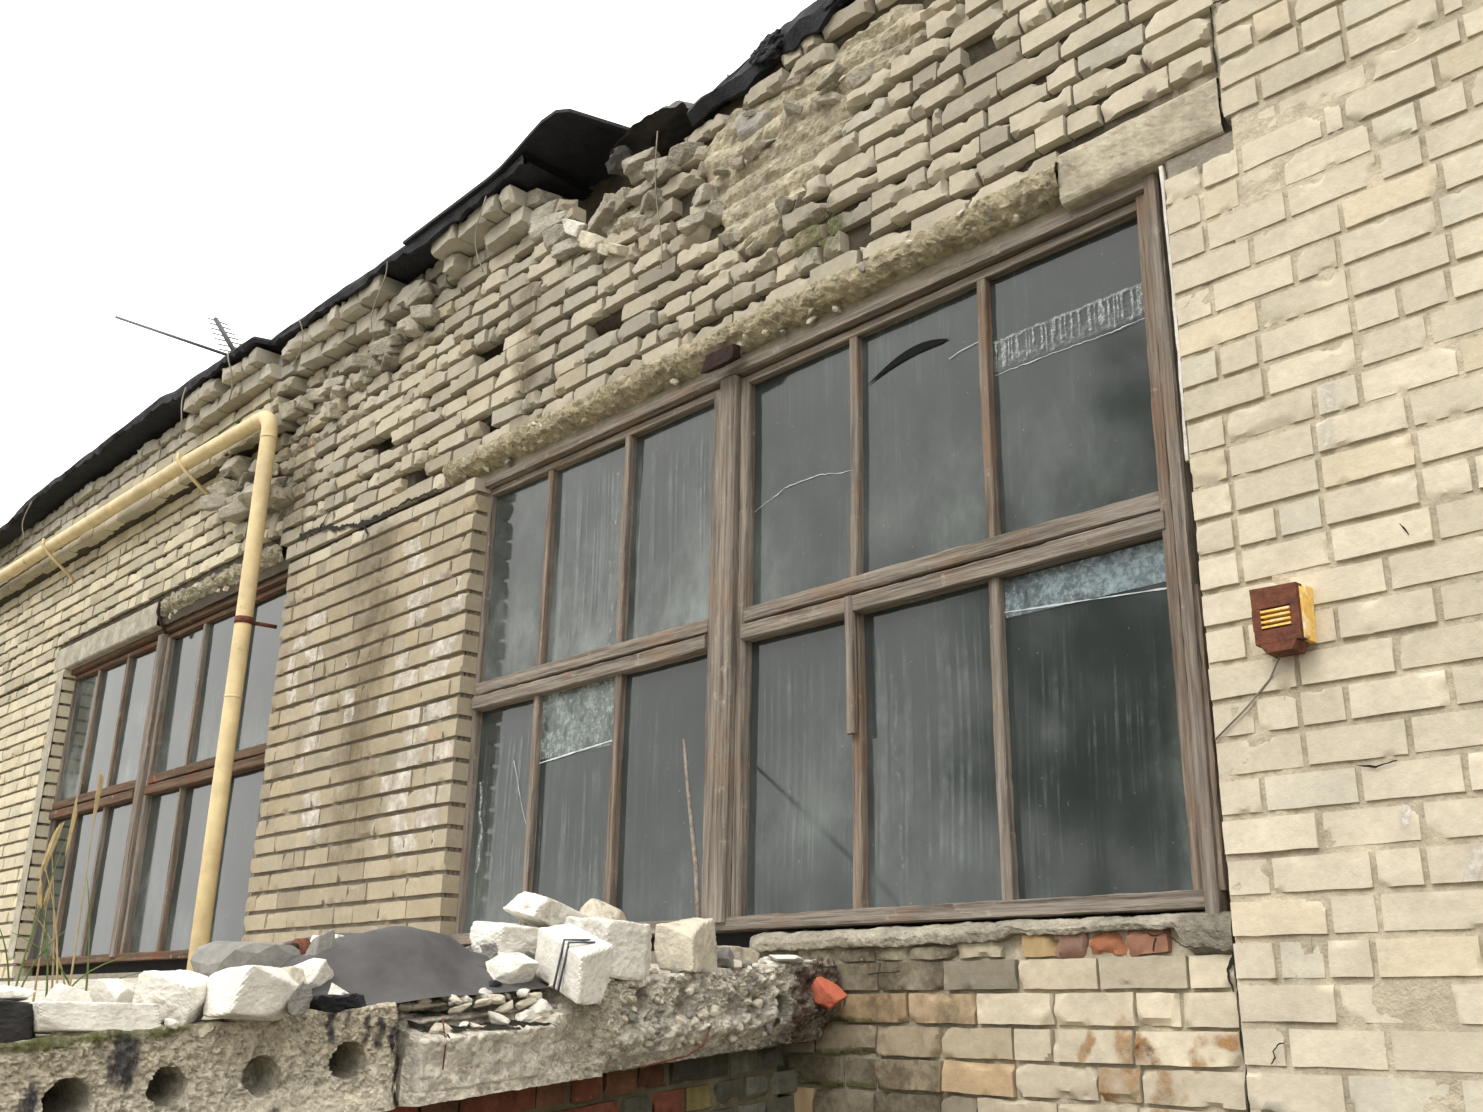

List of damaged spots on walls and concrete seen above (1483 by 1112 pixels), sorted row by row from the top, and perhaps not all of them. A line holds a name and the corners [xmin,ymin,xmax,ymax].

spalling [676,4,929,260]
spalling [442,162,1061,487]
damp [371,518,462,629]
damp [286,582,455,798]
damp [302,792,321,835]
damp [381,699,452,859]
spalling [609,975,784,1068]
rust [1098,1030,1172,1112]
rust [1217,1035,1240,1051]